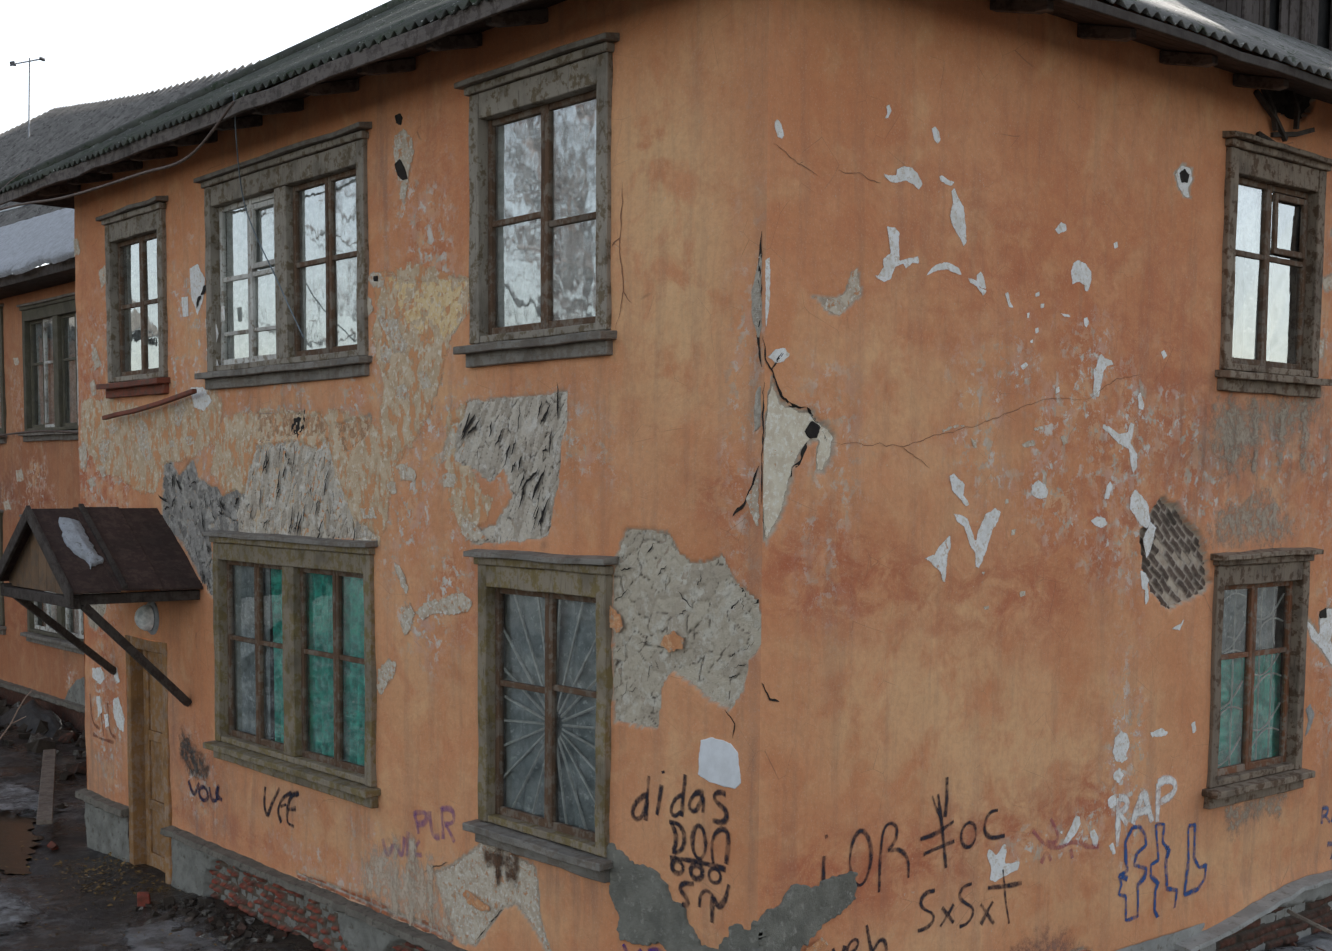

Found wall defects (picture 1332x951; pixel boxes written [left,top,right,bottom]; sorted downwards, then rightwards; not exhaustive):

peeling [876,226,986,295]
peeling [940,175,967,246]
peeling [1071,260,1092,291]
peeling [78,261,568,595]
spalling [746,386,833,538]
crack [733,232,1143,530]
peeling [1102,393,1144,473]
peeling [950,473,1009,575]
spalling [1130,490,1205,609]
spalling [609,529,761,728]
peeling [1307,608,1332,664]
peeling [209,844,550,951]